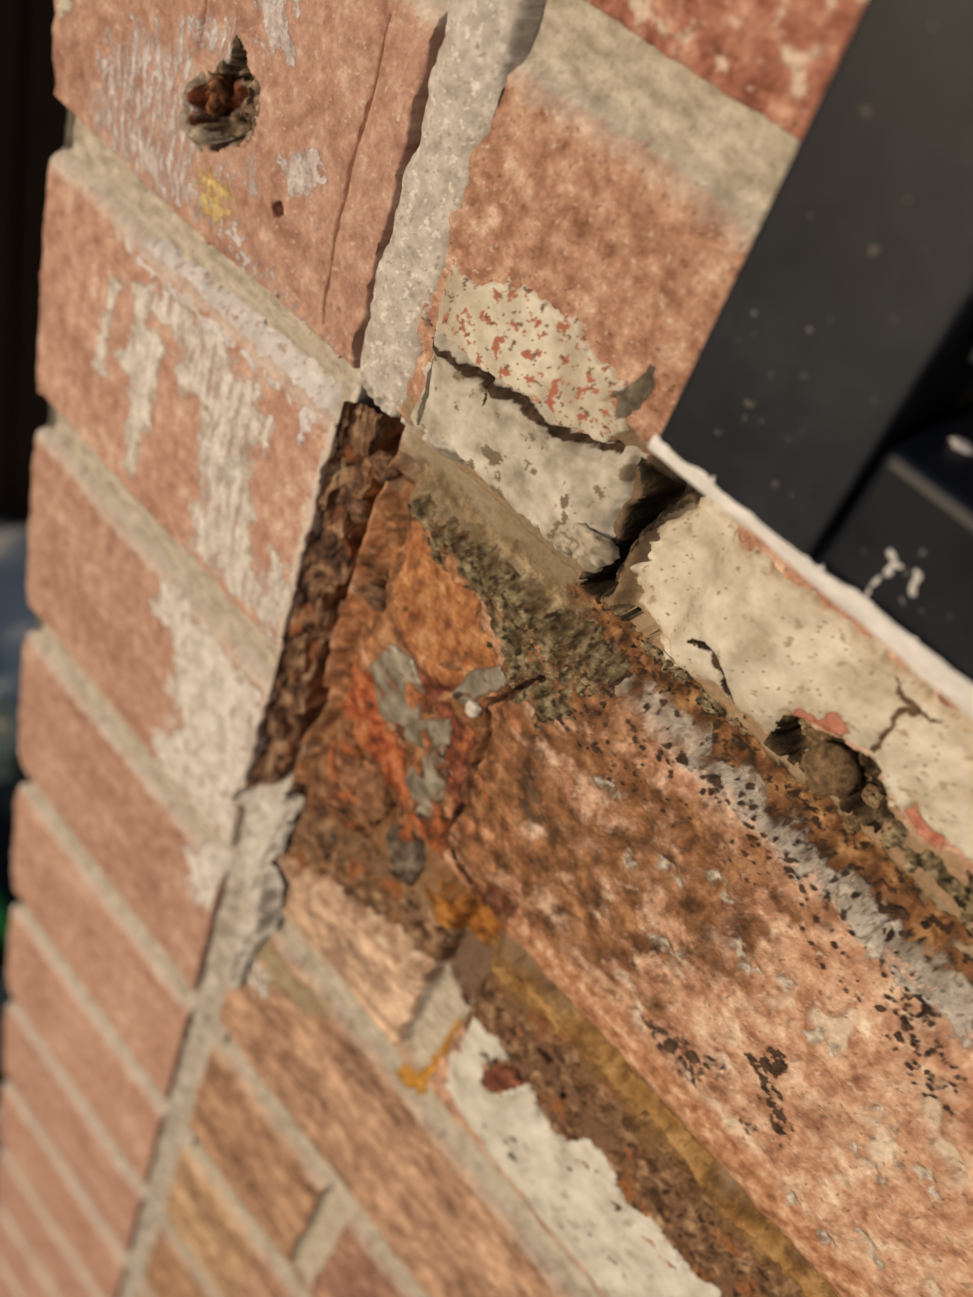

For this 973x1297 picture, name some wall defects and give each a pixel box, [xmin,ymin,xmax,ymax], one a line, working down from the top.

spalling [179,35,260,153]
crack [425,296,626,454]
peeling [411,258,973,931]
rust [246,401,518,946]
rust [566,583,973,985]
spalling [277,781,464,983]
spalling [730,939,796,987]
rust [393,1018,463,1096]
rust [480,1064,528,1093]
spalling [804,1027,837,1057]
spalling [893,1154,940,1198]